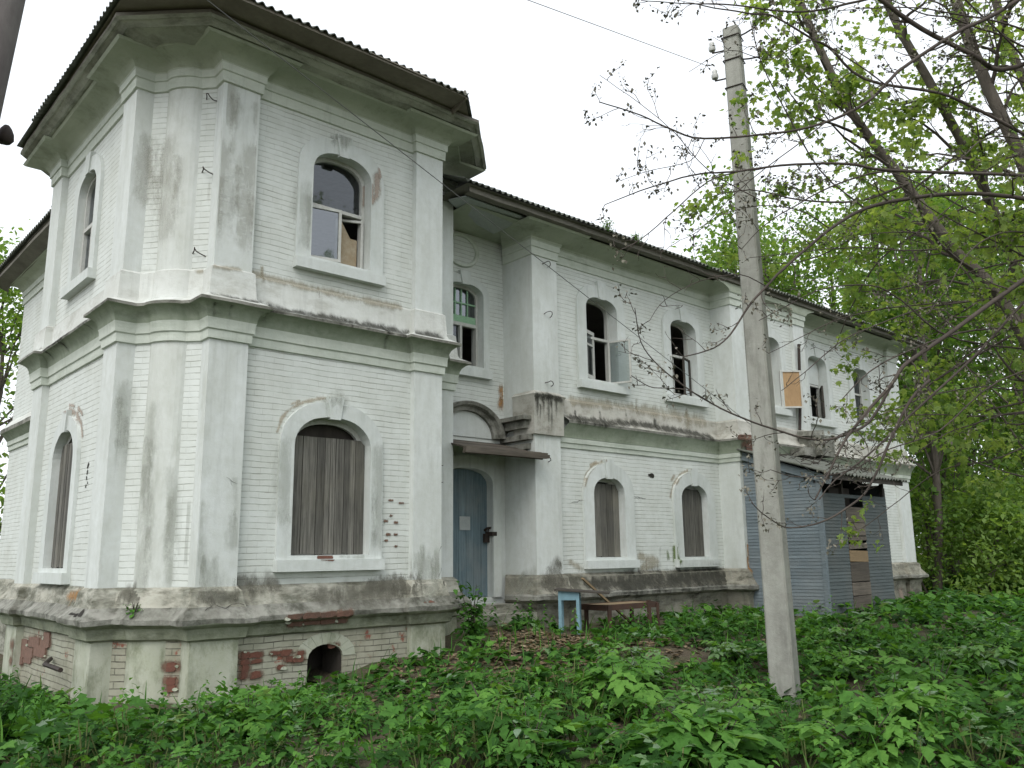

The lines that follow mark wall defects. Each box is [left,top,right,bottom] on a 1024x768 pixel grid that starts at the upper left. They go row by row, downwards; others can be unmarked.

peeling [363,168,381,206]
water stain [534,393,714,440]
water stain [118,586,140,601]
water stain [200,576,279,604]
water stain [315,577,416,604]
flaking render [285,611,352,627]
flaking render [9,632,51,666]
flaking render [161,661,180,693]
flaking render [238,649,306,680]